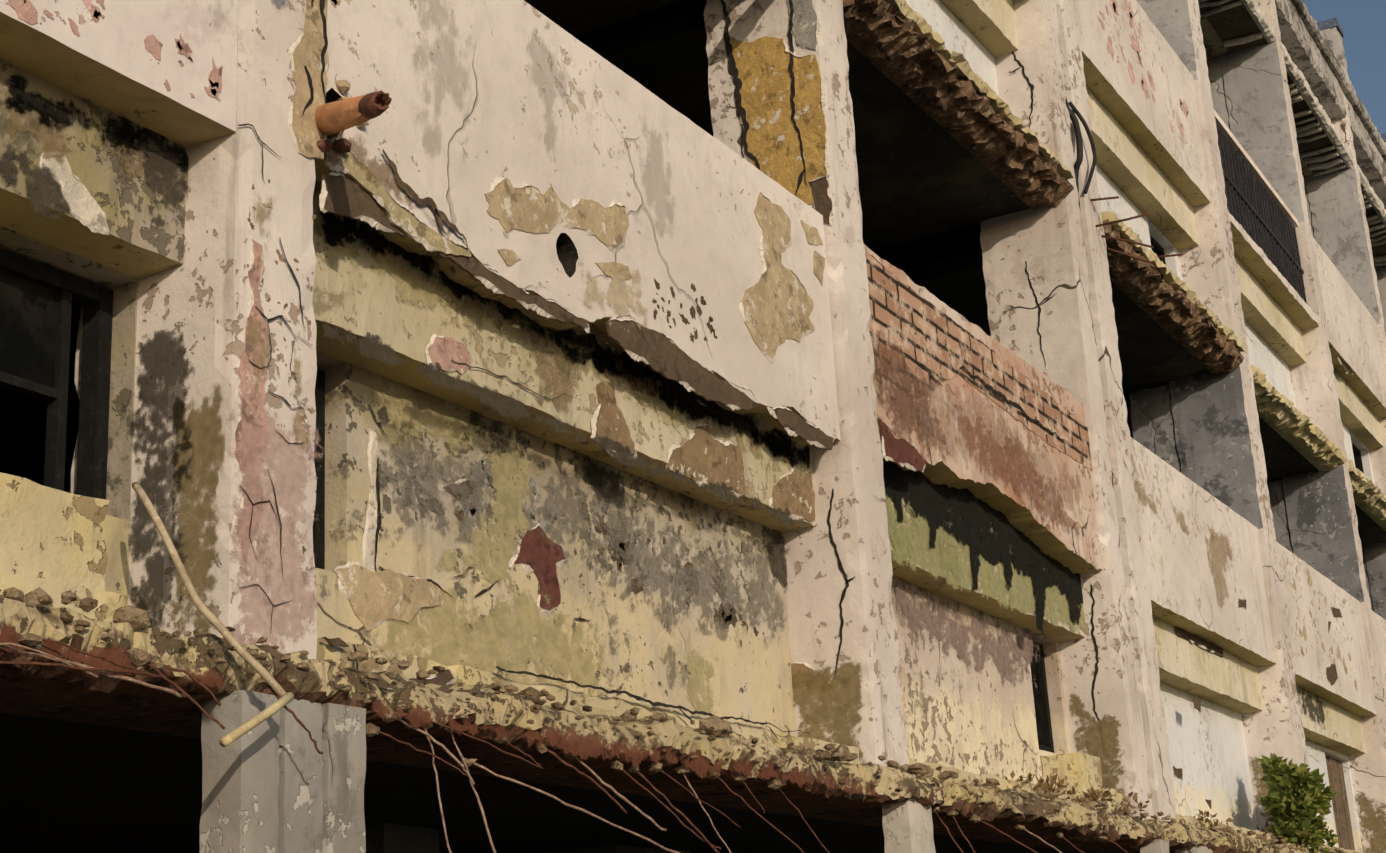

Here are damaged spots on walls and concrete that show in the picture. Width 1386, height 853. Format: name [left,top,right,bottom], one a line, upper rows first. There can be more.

mould [0,74,189,227]
peeling [190,58,223,101]
crack [302,0,328,115]
flaking render [287,0,836,458]
crack [720,0,760,170]
crack [788,0,808,196]
flaking render [665,421,746,498]
flaking render [866,252,1093,533]
rust [0,623,224,690]
crack [827,489,855,676]
water stain [883,458,1083,687]
crack [1090,584,1108,774]